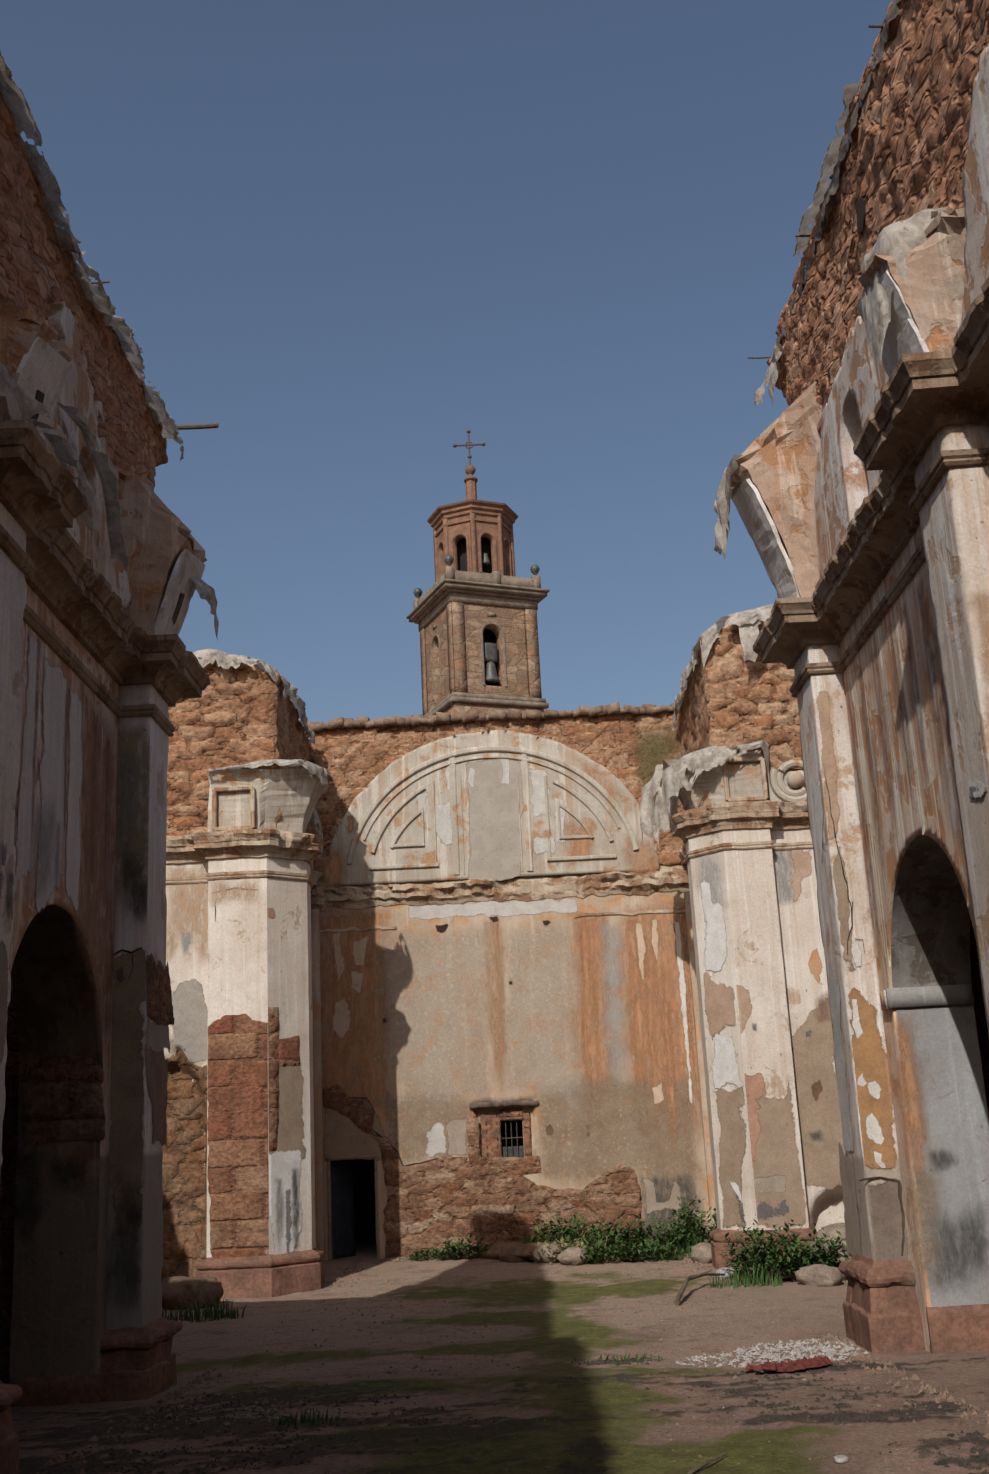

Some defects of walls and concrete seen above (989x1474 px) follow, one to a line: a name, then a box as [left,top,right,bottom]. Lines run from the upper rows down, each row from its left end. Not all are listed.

spalling [856,197,866,235]
peeling [15,633,83,913]
flaking render [0,928,14,1064]
flaking render [21,918,642,1282]
water stain [387,1097,469,1161]
water stain [540,929,697,1245]
peeling [636,919,692,1104]
flaking render [700,691,908,1261]